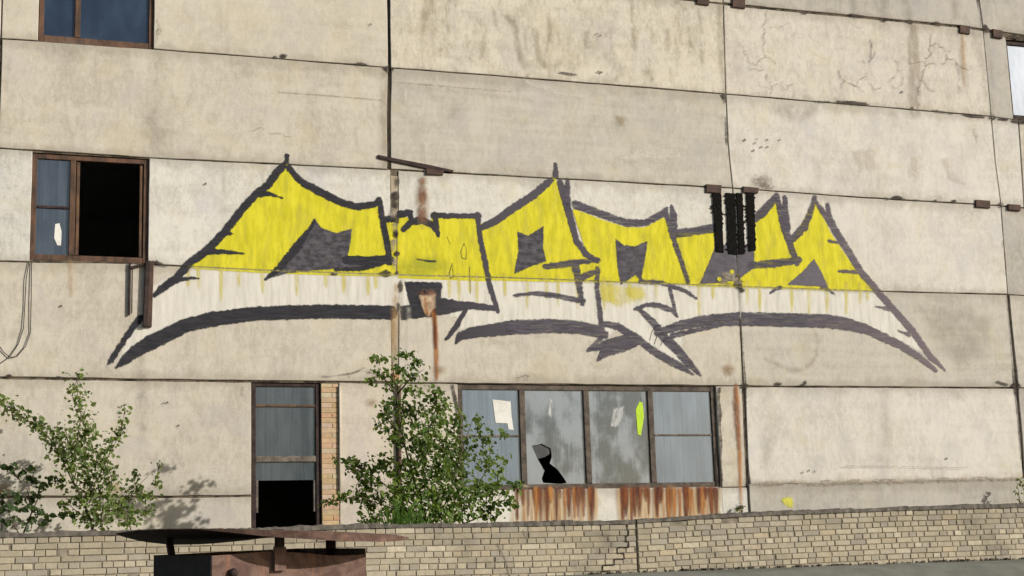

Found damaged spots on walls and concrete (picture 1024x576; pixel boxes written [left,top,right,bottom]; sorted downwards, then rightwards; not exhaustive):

corrosion [431,309,440,380]
corrosion [733,384,742,493]
corrosion [516,486,598,521]
corrosion [617,486,719,520]
crack [602,525,639,573]